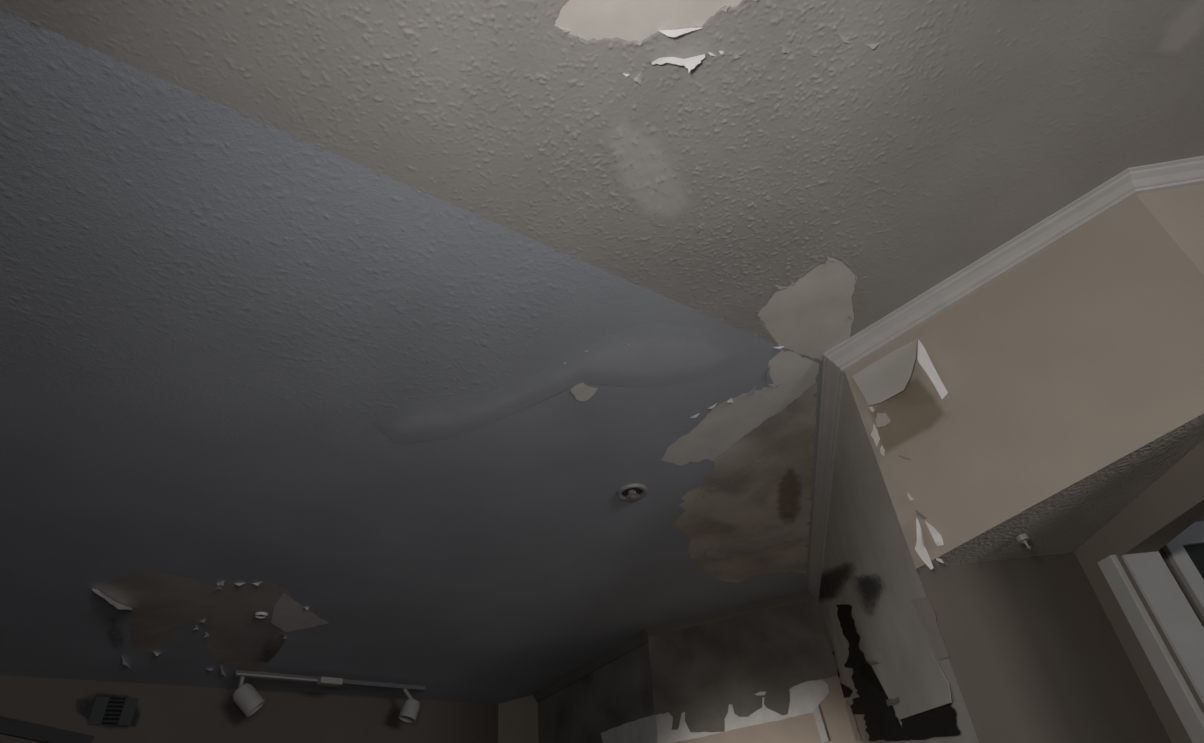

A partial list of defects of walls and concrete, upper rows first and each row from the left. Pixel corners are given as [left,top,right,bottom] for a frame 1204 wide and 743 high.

peeling [554,0,758,46]
peeling [662,256,858,466]
peeling [852,339,948,456]
damp [648,382,910,741]
peeling [92,570,329,677]
peeling [601,714,658,743]